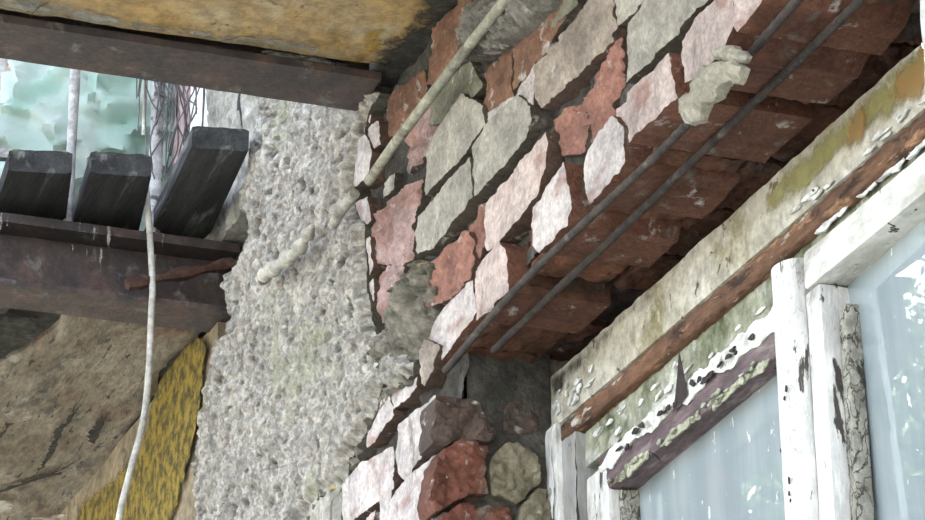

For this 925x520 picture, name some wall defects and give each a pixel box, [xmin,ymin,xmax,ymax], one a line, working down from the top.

leakage [369,0,458,88]
corrosion [889,48,925,104]
leakage [766,45,922,212]
corrosion [845,108,866,148]
peeling [863,94,925,157]
peeling [789,180,833,215]
peeling [814,206,848,235]
peeling [856,139,925,198]
peeling [593,306,776,484]
crack [0,403,104,492]